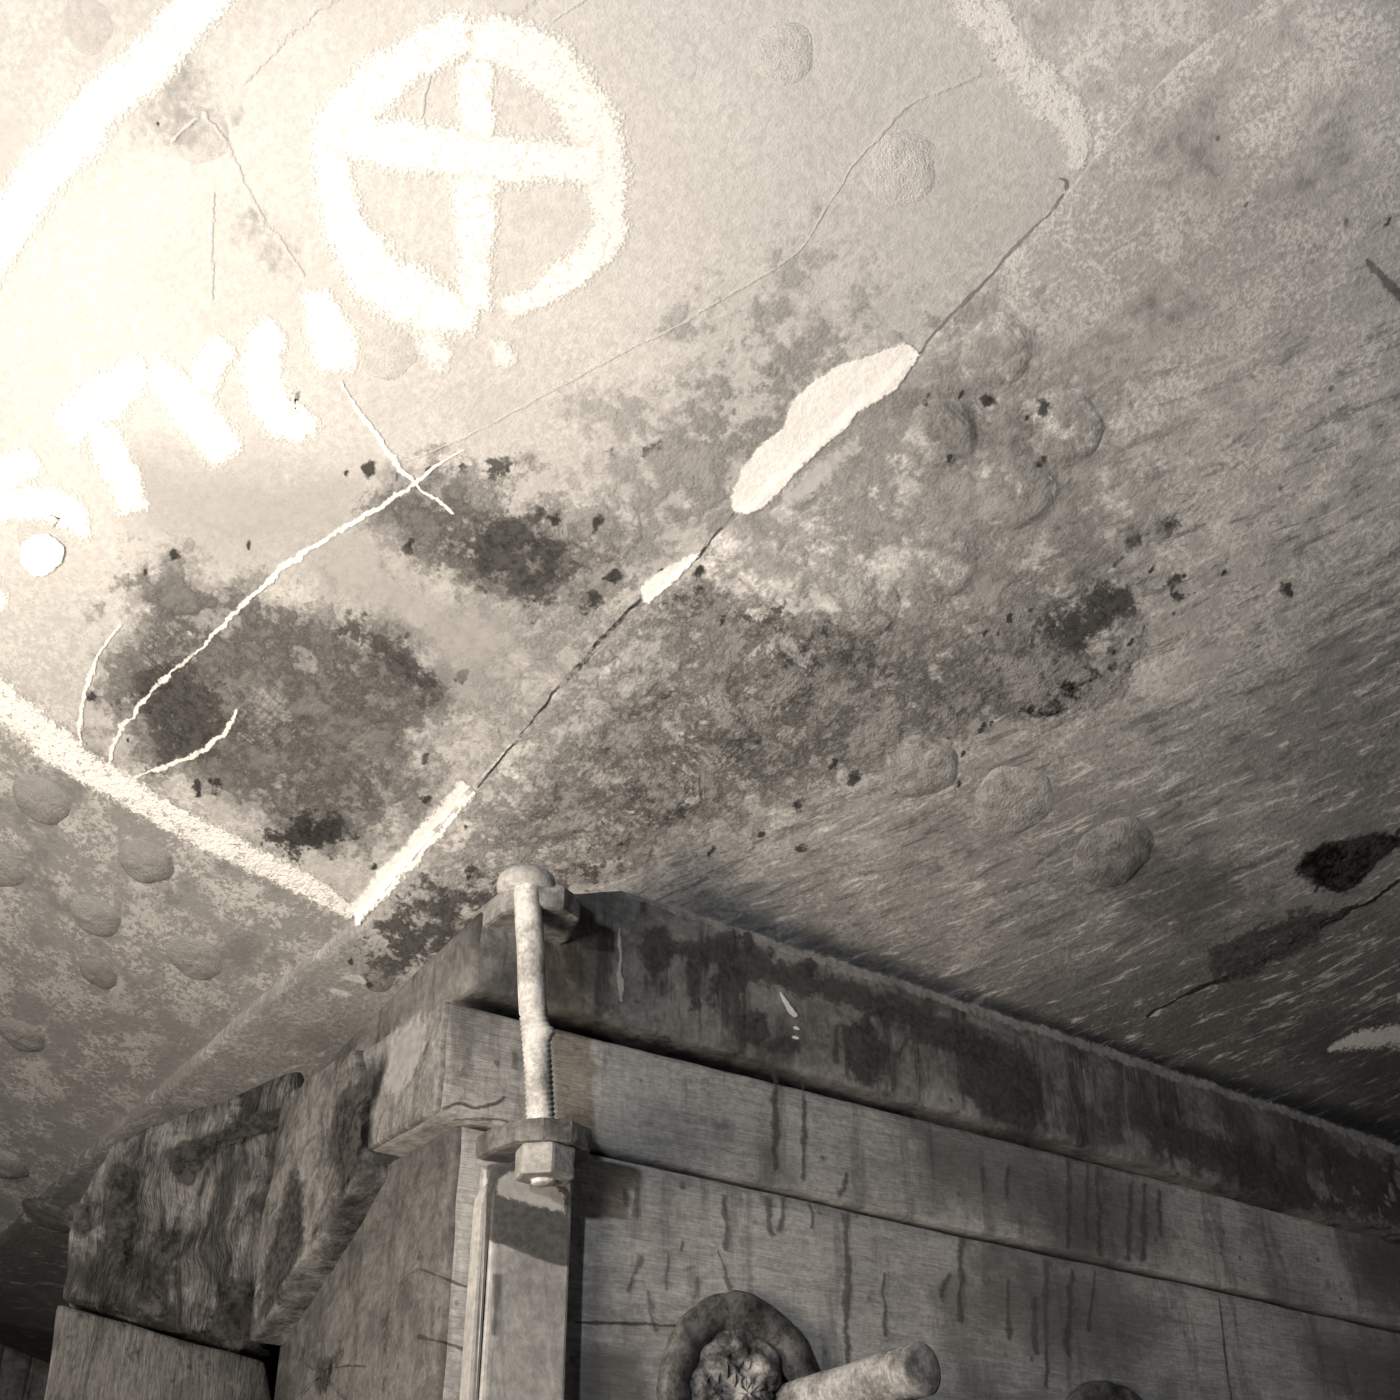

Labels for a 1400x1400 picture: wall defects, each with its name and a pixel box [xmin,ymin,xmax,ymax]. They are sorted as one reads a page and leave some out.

leakage [958,390,996,407]
leakage [1025,398,1052,420]
crack [695,513,734,560]
crack [477,598,641,788]
crack [1146,878,1400,1018]